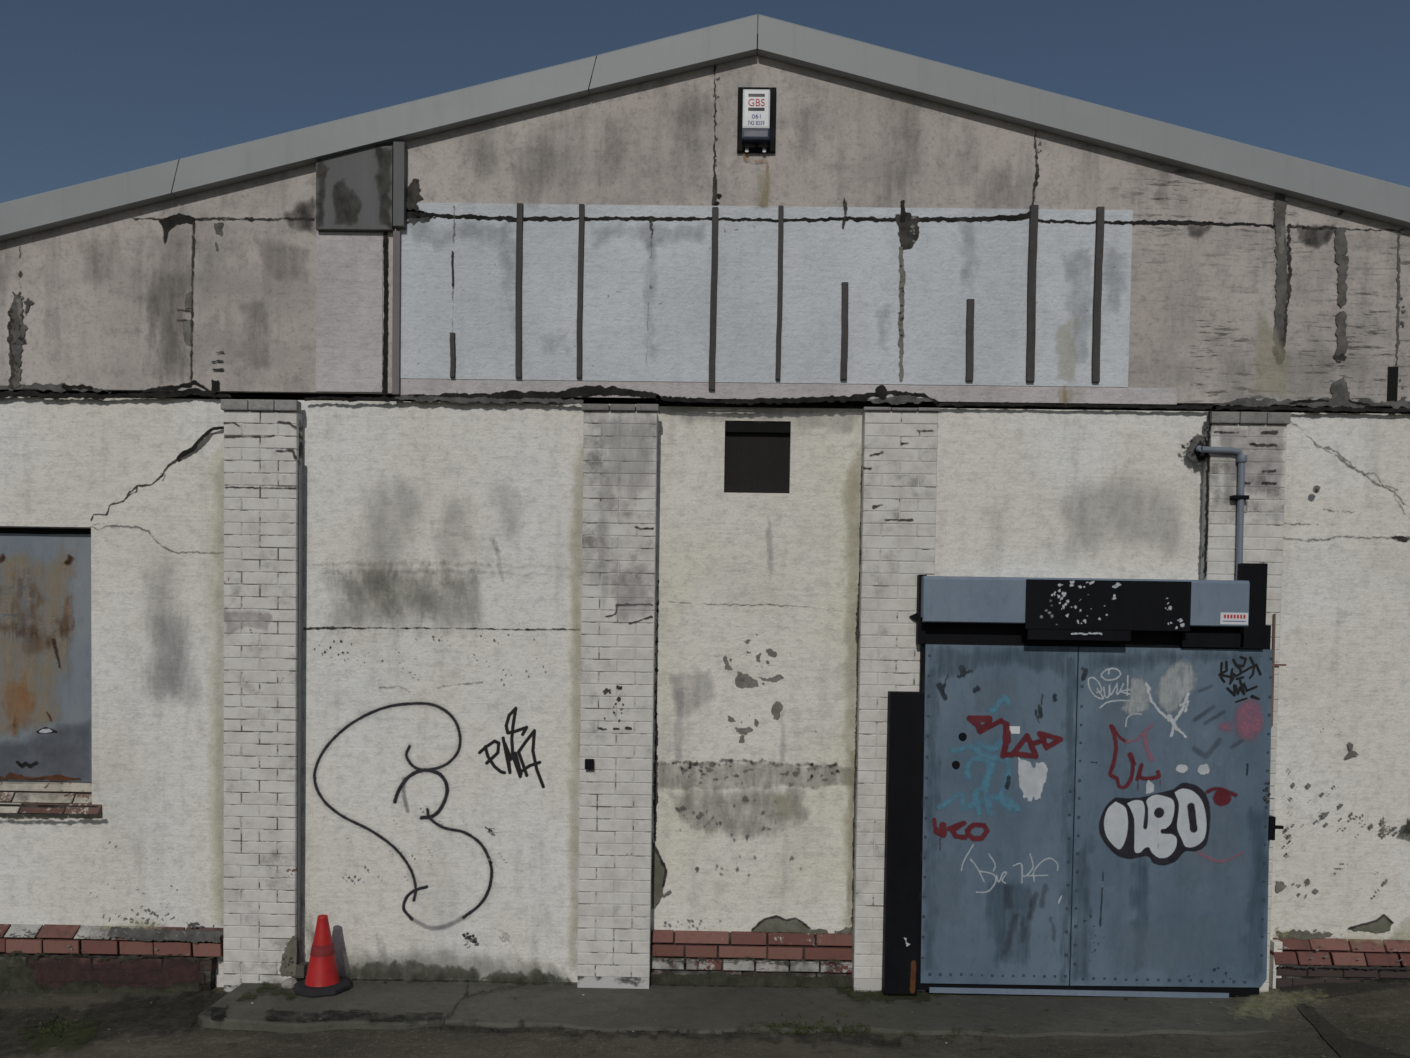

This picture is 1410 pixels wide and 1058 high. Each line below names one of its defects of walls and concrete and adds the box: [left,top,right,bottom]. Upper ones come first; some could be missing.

spalling [7,292,34,389]
crack [0,213,315,554]
spalling [1272,193,1292,364]
spalling [1330,210,1350,405]
crack [304,65,1410,929]
peeling [723,634,784,688]
rust [0,773,80,781]
peeling [675,800,776,876]
peeling [672,701,840,787]
peeling [1263,769,1398,857]
spalling [1276,878,1318,898]
spalling [1276,914,1410,971]